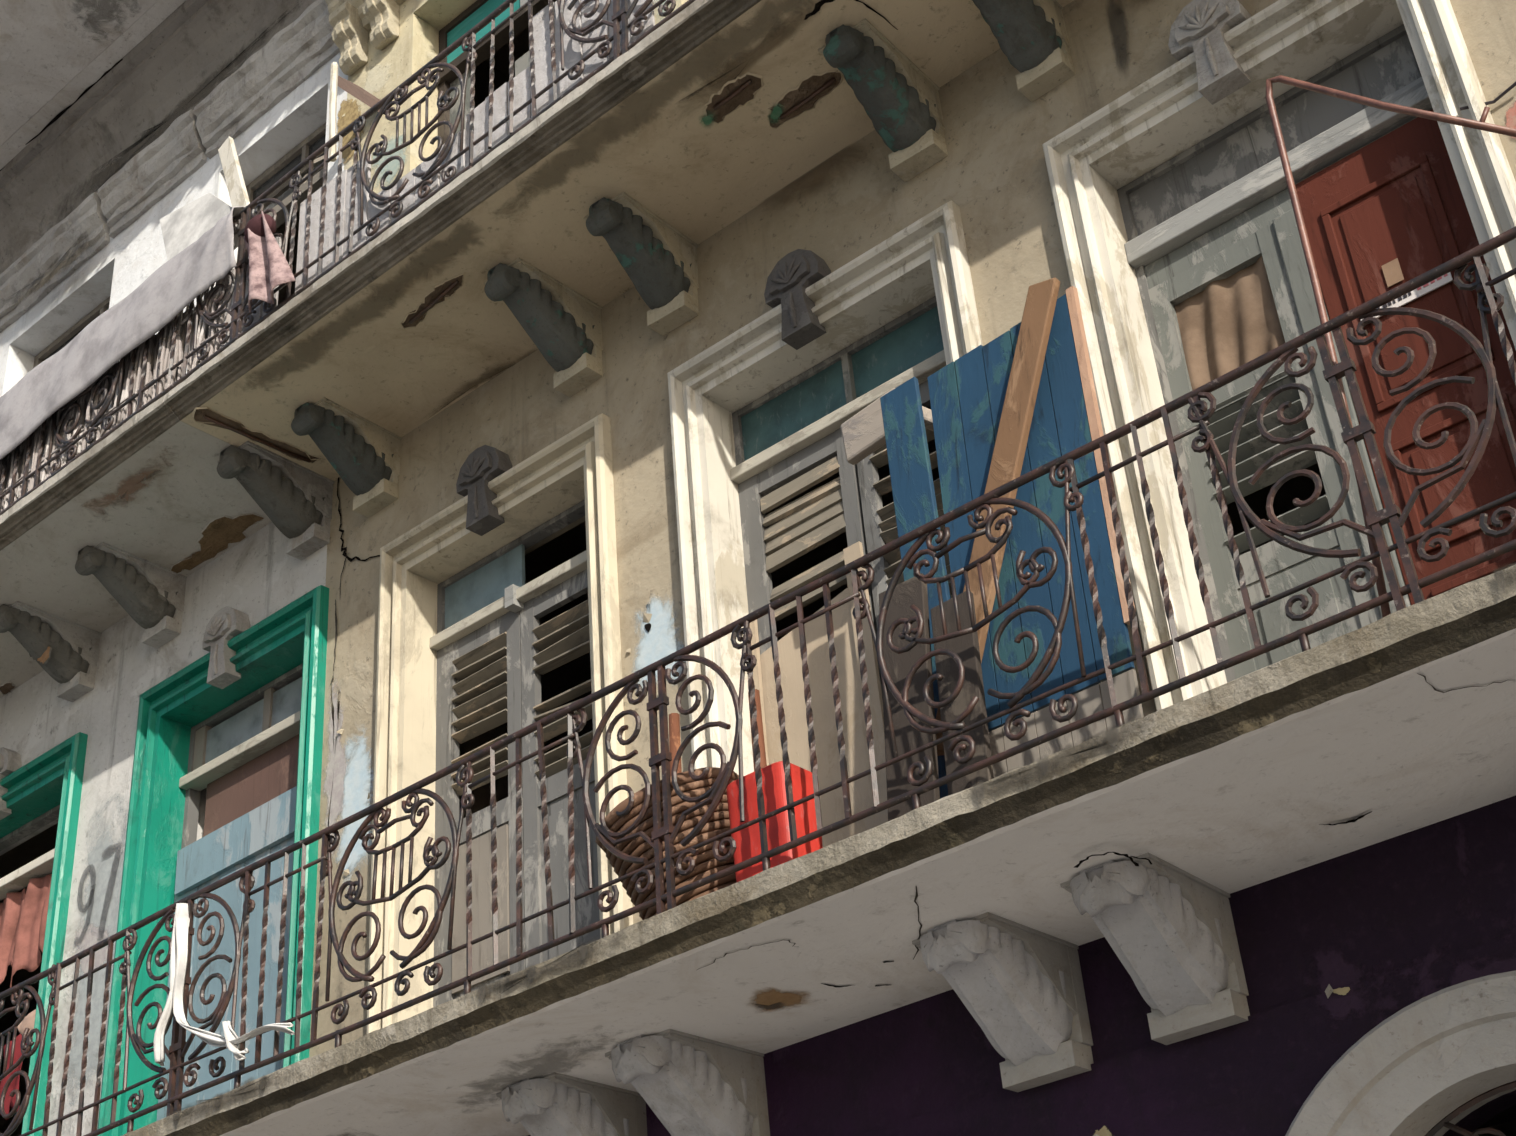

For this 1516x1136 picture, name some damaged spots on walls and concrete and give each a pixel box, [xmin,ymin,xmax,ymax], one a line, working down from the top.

crack [804,0,898,30]
spalling [701,70,844,129]
spalling [170,513,265,574]
crack [333,477,380,671]
peeling [626,599,683,687]
crack [1417,673,1508,693]
peeling [1093,1125,1112,1136]